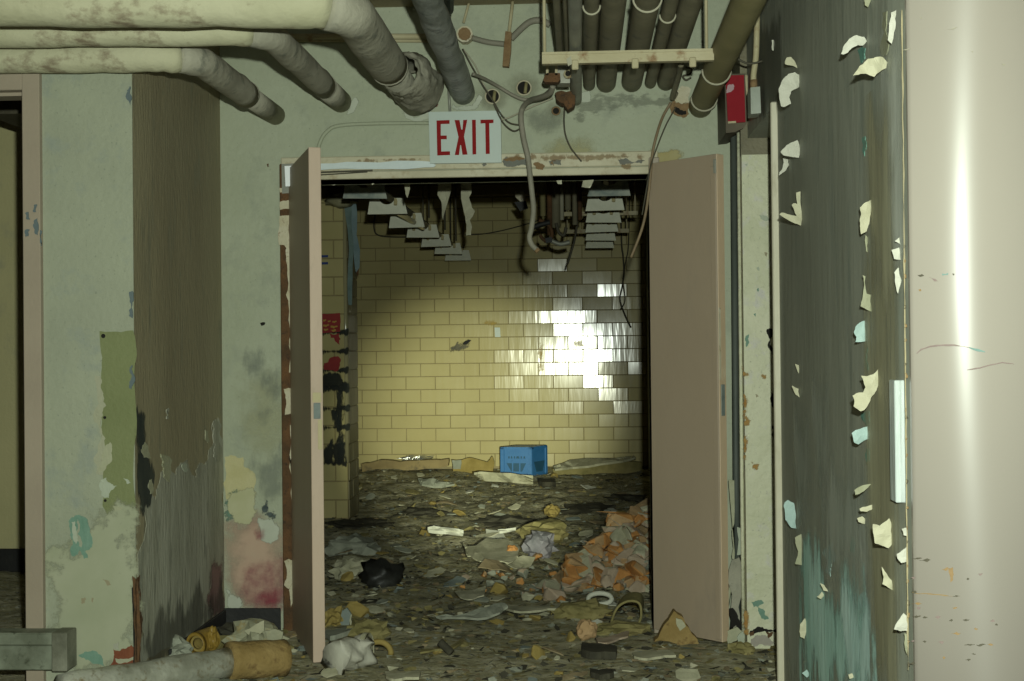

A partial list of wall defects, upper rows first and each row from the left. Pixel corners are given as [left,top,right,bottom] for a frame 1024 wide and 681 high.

peeling [841,11,896,77]
peeling [779,57,799,107]
corrosion [502,156,561,170]
peeling [779,140,800,175]
peeling [438,183,475,235]
peeling [760,192,802,226]
peeling [255,388,291,436]
peeling [784,99,908,681]
peeling [45,291,280,670]
peeling [752,600,769,620]